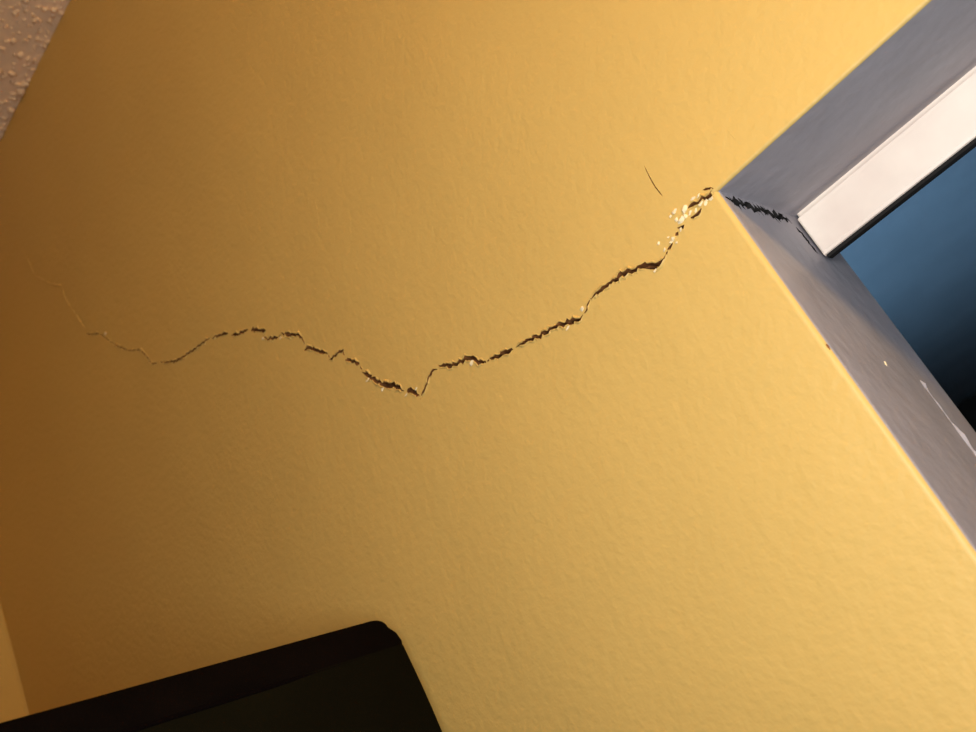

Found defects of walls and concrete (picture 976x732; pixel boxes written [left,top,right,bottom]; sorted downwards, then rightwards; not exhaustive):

crack [28,166,817,399]